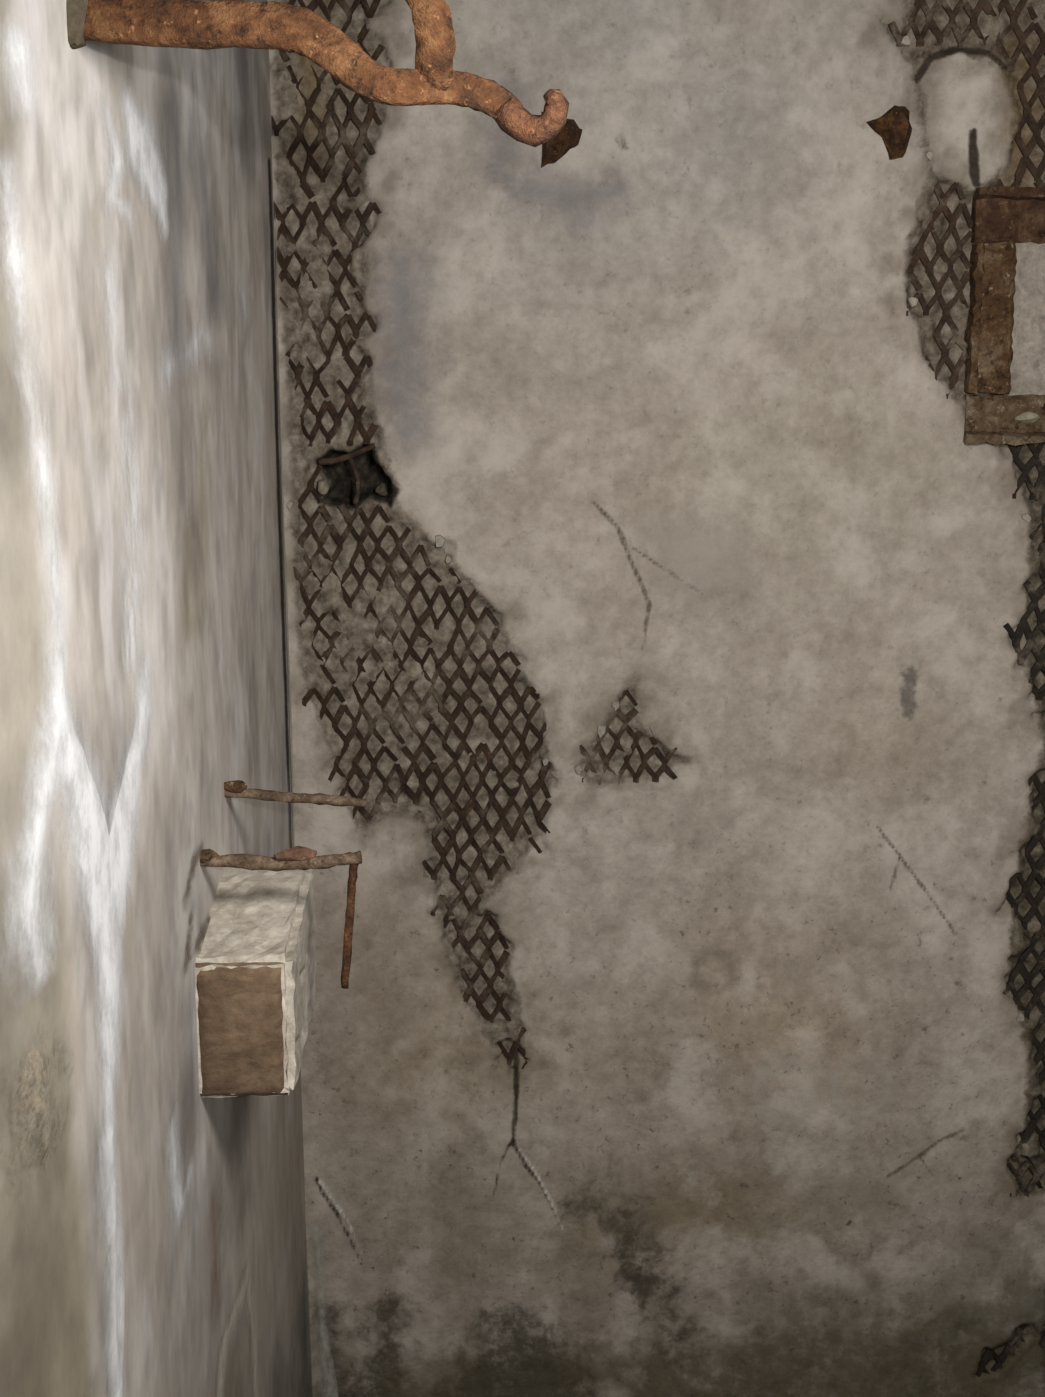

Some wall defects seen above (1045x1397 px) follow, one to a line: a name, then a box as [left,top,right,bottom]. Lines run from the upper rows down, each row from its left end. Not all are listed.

spalling [275,0,385,62]
spalling [888,0,1045,414]
spalling [271,50,554,1069]
corrosion [224,780,367,808]
spalling [574,686,689,785]
spalling [1003,442,1045,1198]
corrosion [200,846,362,989]
crack [496,1049,562,1227]
leakage [304,1228,405,1397]
leakage [435,1312,594,1397]
leakage [565,1200,690,1342]
spalling [975,1323,1045,1381]